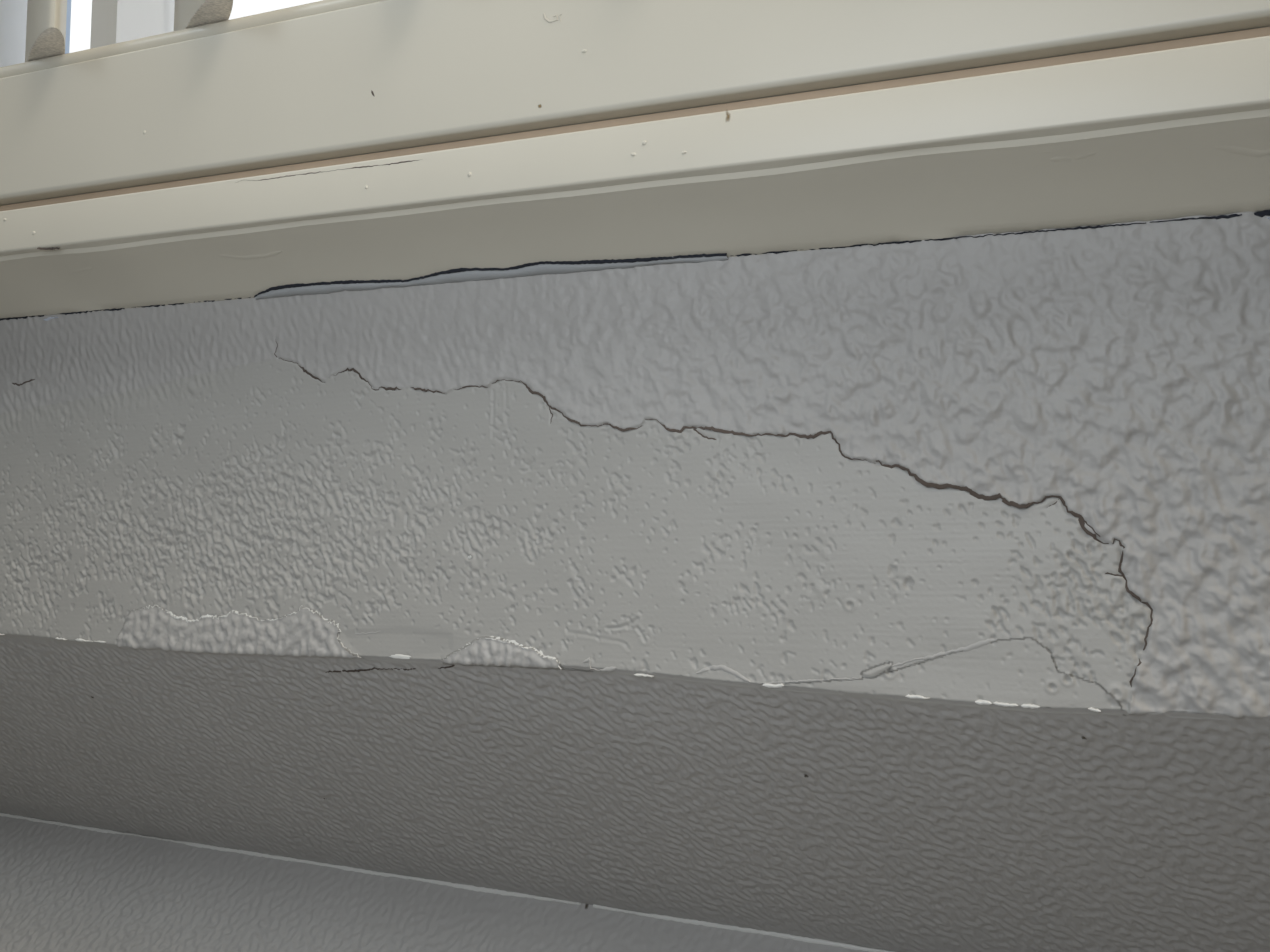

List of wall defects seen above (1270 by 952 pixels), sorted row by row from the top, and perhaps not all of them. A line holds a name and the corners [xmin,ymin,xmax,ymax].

crack [0,210,1270,321]
spalling [975,700,1040,709]